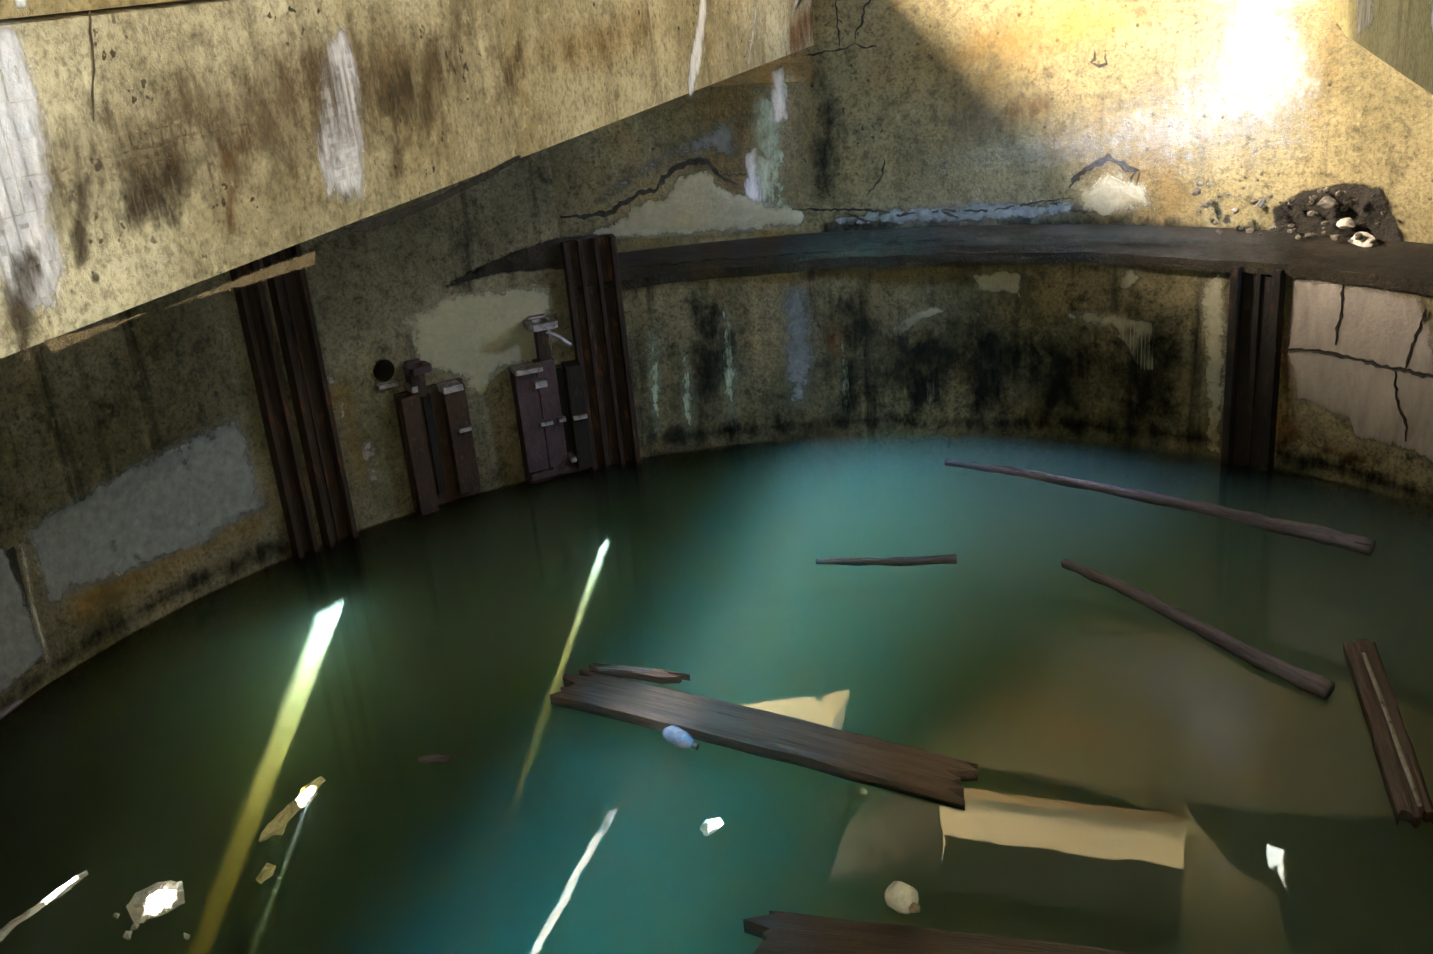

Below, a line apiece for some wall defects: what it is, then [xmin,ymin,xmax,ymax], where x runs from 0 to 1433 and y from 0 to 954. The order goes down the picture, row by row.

efflorescence [688,0,706,95]
crack [804,0,876,56]
leakage [0,29,91,362]
leakage [124,149,184,226]
spalling [341,155,521,232]
peeling [446,170,804,287]
crack [560,156,748,220]
peeling [599,121,736,202]
leakage [648,274,1225,453]
crack [1280,285,1433,441]